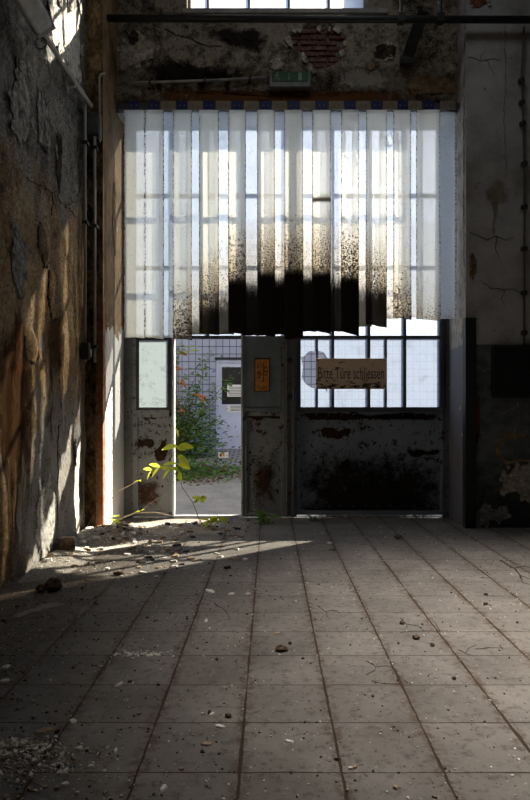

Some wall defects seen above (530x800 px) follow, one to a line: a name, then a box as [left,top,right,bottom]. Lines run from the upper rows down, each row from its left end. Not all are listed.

flaking render [285,24,347,73]
spalling [374,39,398,61]
peeling [7,54,34,146]
crack [26,177,77,218]
peeling [476,460,530,528]